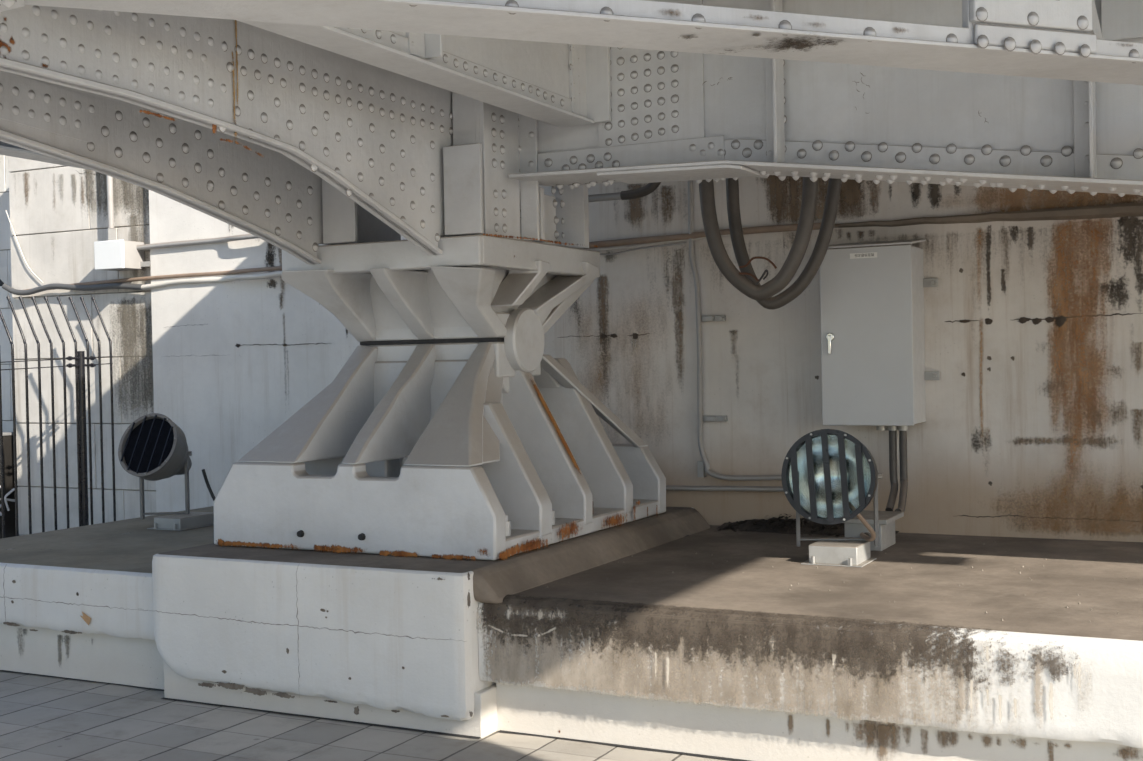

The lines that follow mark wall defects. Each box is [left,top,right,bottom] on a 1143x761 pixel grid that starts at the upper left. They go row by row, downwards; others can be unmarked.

rust [212,20,262,156]
water stain [71,169,149,274]
water stain [764,175,803,238]
water stain [815,178,892,220]
water stain [911,183,959,207]
rust [987,188,1137,471]
rust [601,500,658,528]
rust [218,539,297,549]
rust [314,545,363,553]
rust [432,521,579,560]
water stain [476,594,1081,757]
water stain [1119,747,1138,759]